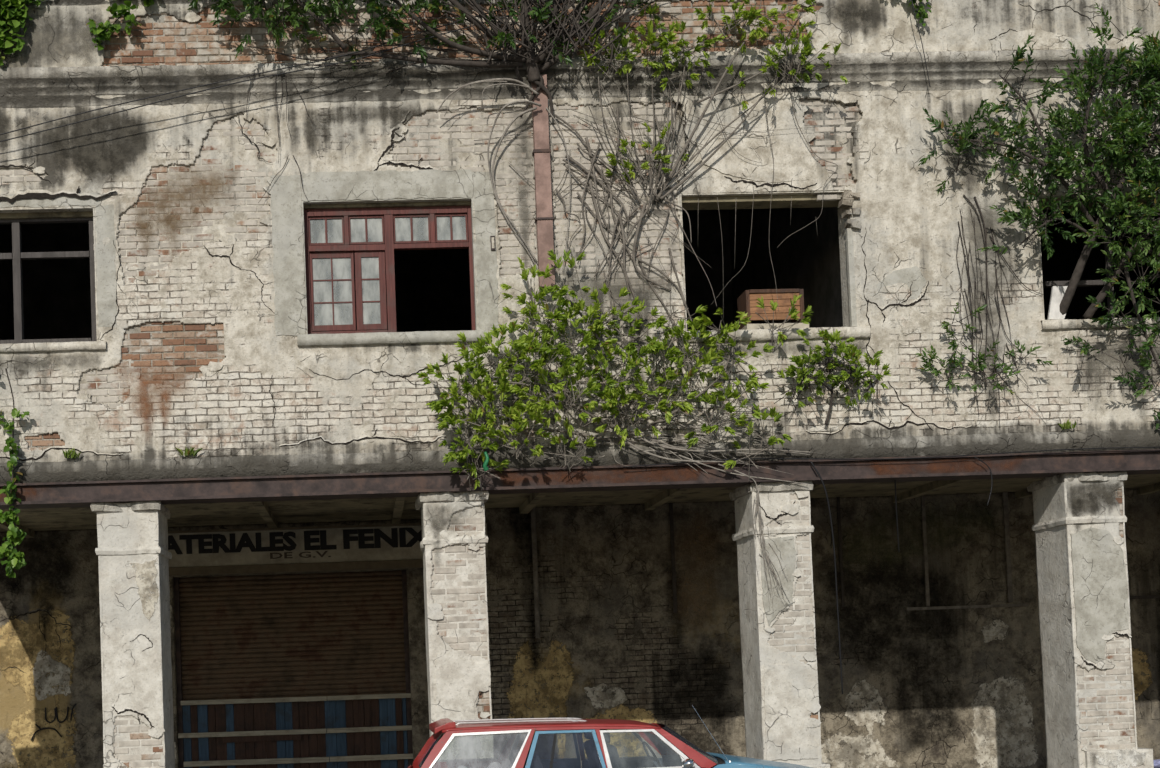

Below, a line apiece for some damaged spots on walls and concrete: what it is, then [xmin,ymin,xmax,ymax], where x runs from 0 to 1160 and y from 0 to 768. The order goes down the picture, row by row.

water stain [49,116,148,179]
spalling [117,112,278,285]
peeling [695,95,862,230]
crack [204,244,275,314]
crack [806,227,972,435]
rust [138,374,168,429]
water stain [1072,482,1120,528]
water stain [0,538,72,638]
spalling [427,506,491,738]
water stain [827,558,961,746]
peeling [1070,486,1152,768]
crack [1112,630,1132,638]